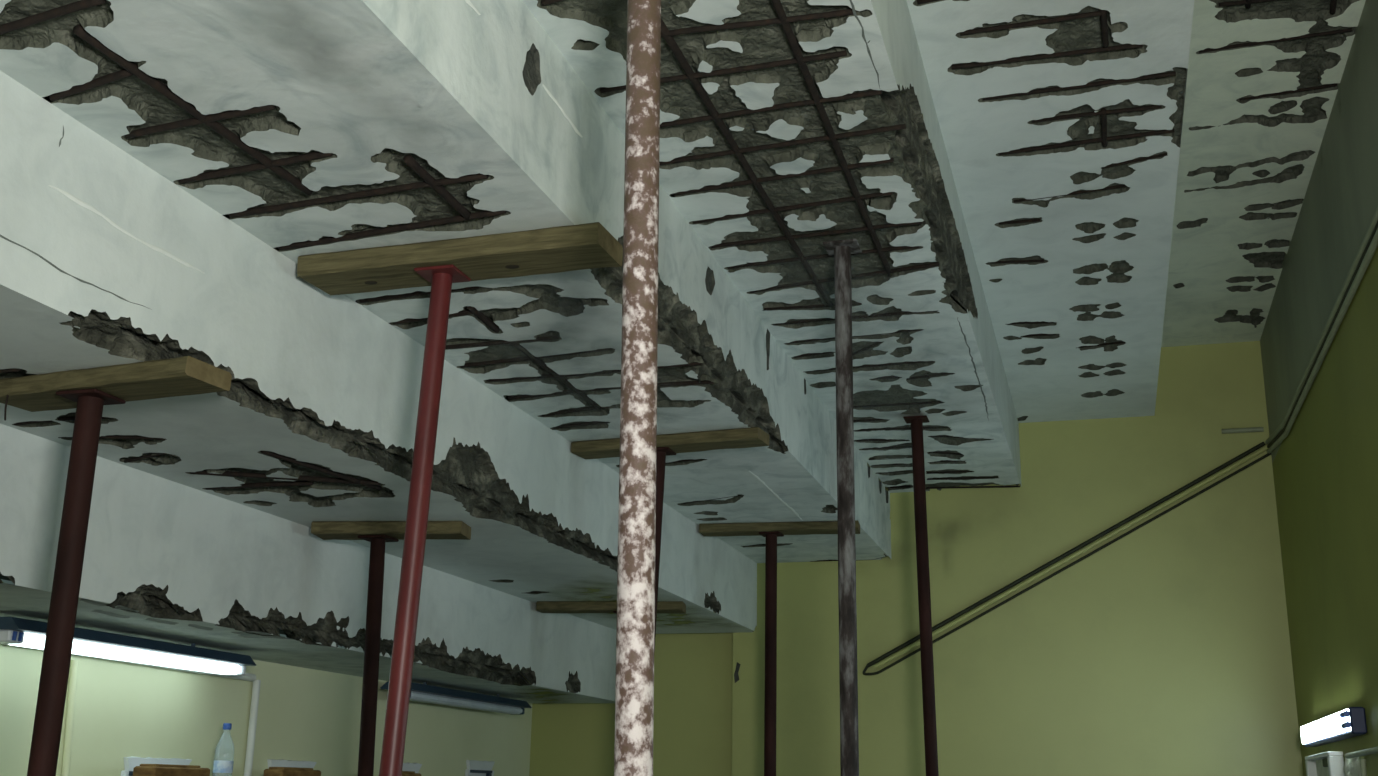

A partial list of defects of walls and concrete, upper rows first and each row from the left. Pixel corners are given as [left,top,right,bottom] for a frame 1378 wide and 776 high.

spalling [0,0,511,252]
spalling [522,43,541,96]
spalling [537,0,628,64]
spalling [947,6,1148,75]
spalling [978,0,1360,229]
crack [0,235,152,310]
spalling [445,236,623,431]
spalling [657,0,1021,503]
spalling [60,309,413,507]
spalling [431,438,618,572]
spalling [80,584,393,656]
spalling [413,637,536,686]